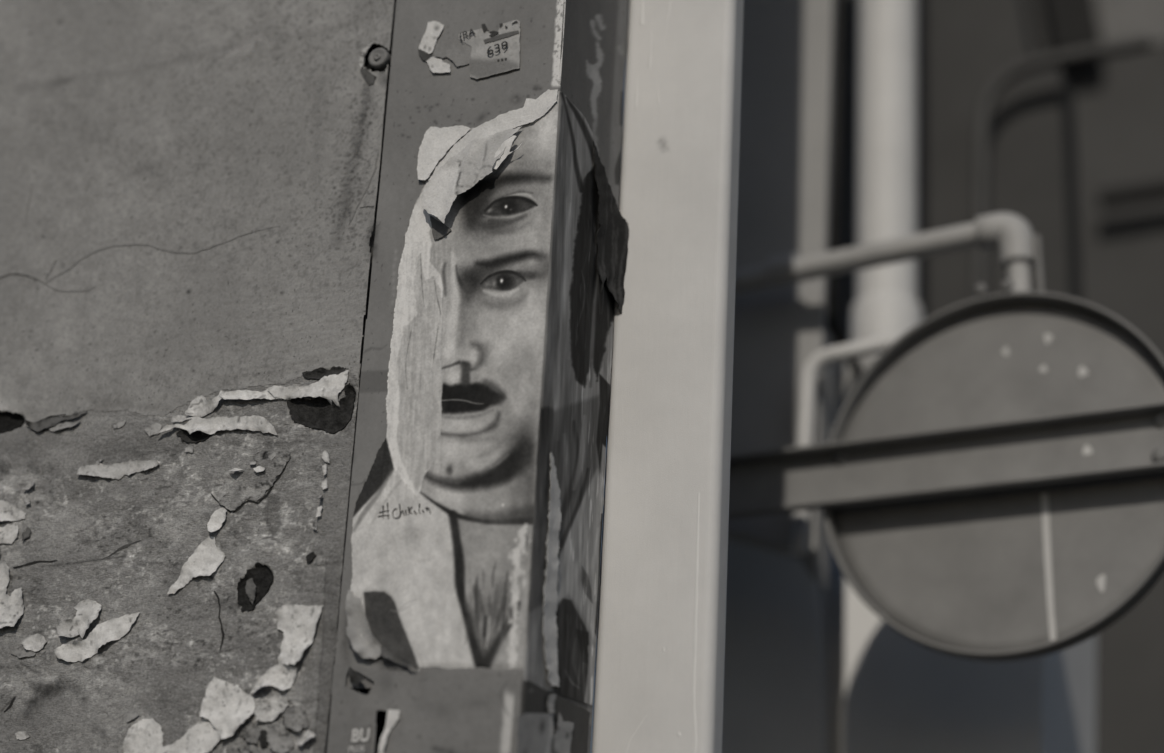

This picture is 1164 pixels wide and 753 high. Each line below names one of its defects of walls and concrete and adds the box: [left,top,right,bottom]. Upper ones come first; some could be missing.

crack [0,226,276,292]
peeling [25,410,88,432]
peeling [144,370,349,453]
peeling [0,481,35,629]
peeling [11,599,140,662]
peeling [77,458,159,480]
peeling [167,449,291,595]
spalling [245,578,256,604]
peeling [312,450,330,530]
peeling [123,604,323,753]